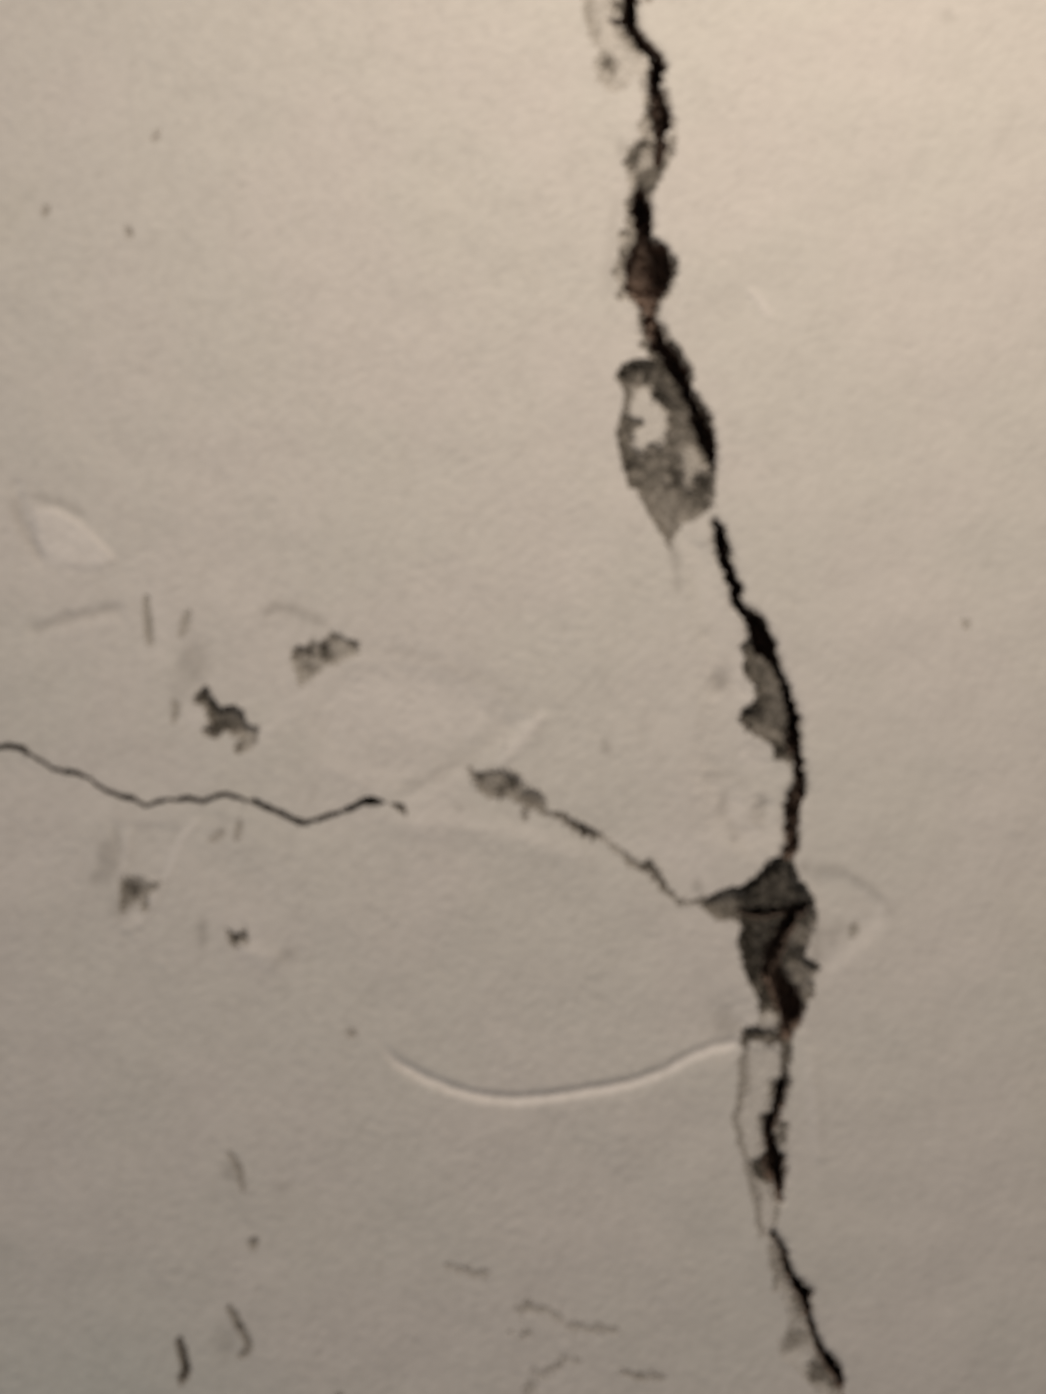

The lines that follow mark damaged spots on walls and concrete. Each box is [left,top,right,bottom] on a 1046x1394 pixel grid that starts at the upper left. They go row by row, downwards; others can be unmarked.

crack [625,0,670,168]
crack [627,201,716,475]
peeling [191,685,260,755]
peeling [289,631,361,690]
crack [713,522,805,853]
crack [0,743,407,826]
crack [466,766,710,907]
crack [732,900,841,1394]
crack [444,1257,491,1281]
crack [508,1298,621,1394]
crack [618,1367,667,1381]